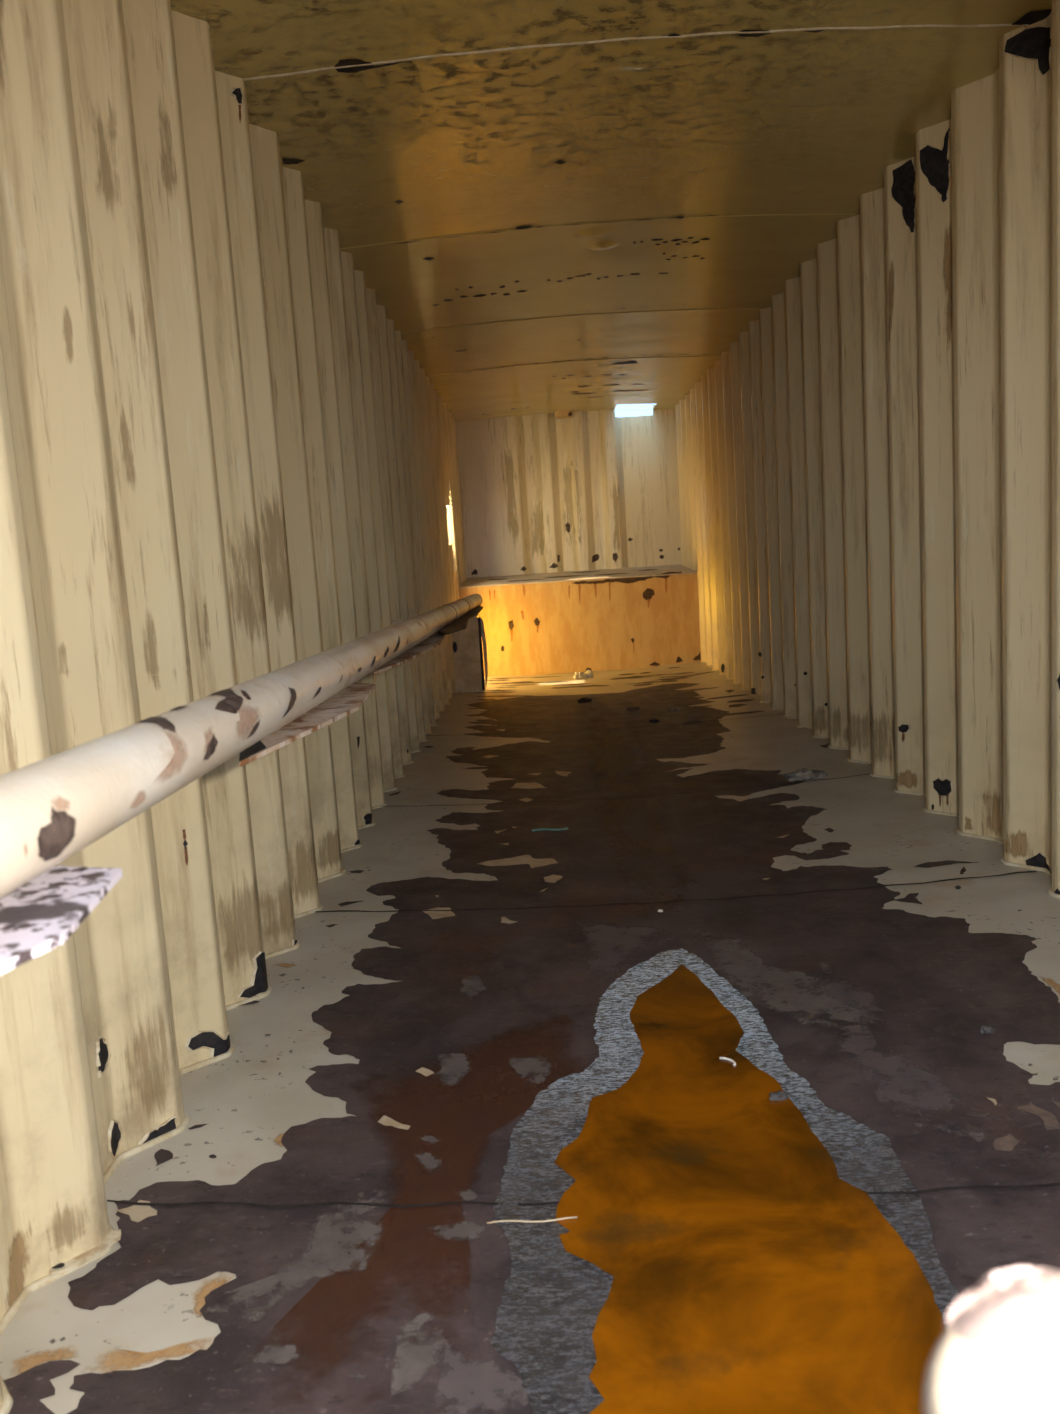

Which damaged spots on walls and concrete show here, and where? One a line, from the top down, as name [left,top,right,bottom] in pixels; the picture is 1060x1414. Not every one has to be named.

peeling [1003,26,1052,75]
peeling [890,127,951,233]
peeling [4,667,1060,1414]